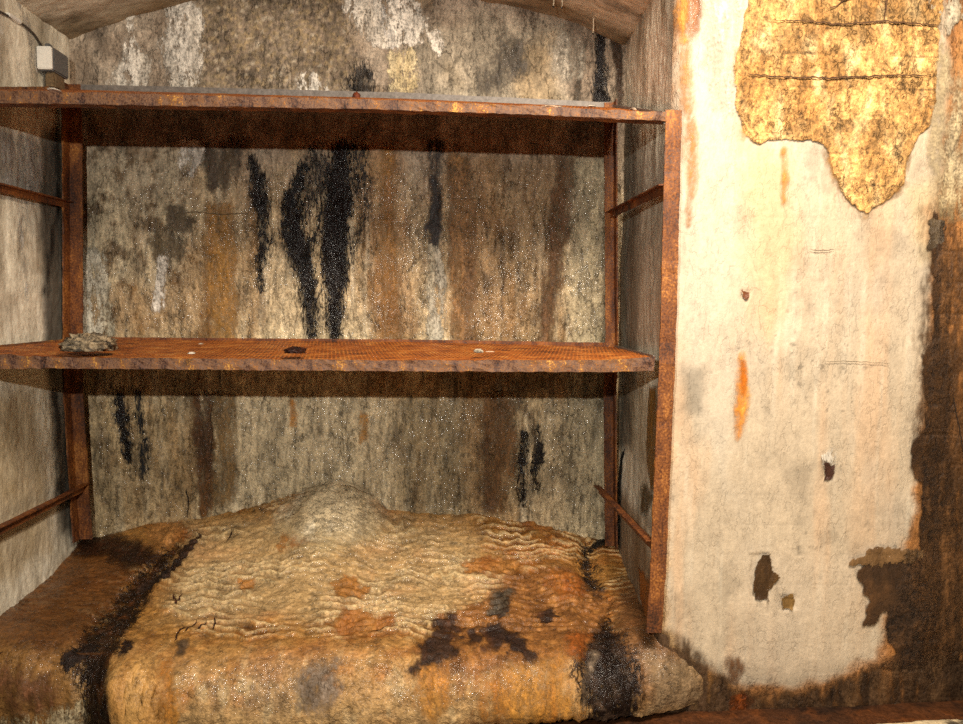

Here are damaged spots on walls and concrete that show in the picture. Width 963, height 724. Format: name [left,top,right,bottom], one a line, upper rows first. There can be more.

leakage [342,0,444,93]
leakage [552,30,624,106]
rust [675,0,702,195]
peeling [734,0,944,213]
rust [199,204,237,338]
leakage [177,138,371,339]
leakage [112,387,149,480]
rust [734,356,749,438]
leakage [654,0,963,712]
rust [148,522,190,547]
spalling [753,554,780,602]
spalling [781,594,795,610]